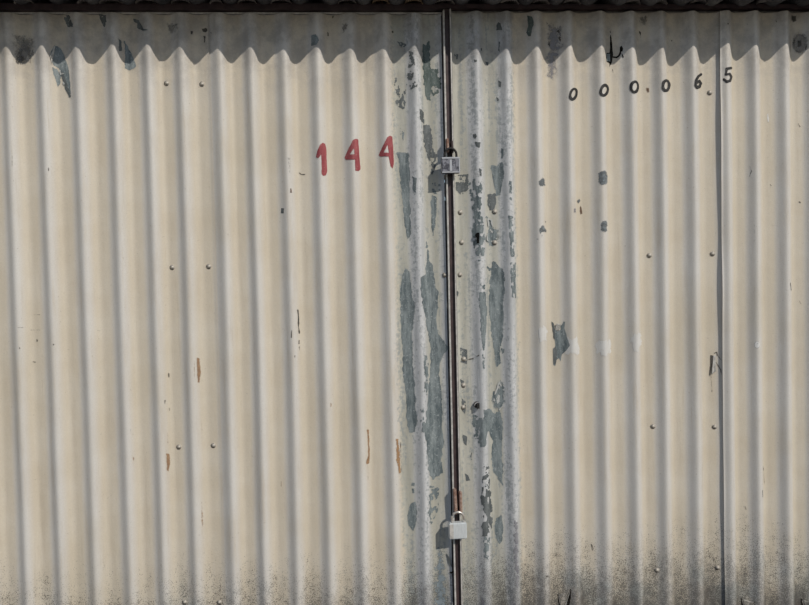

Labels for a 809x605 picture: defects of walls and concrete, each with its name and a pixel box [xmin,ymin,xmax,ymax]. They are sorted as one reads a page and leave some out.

peeling [50,45,71,97]
peeling [392,31,442,109]
peeling [397,109,448,531]
peeling [552,322,570,366]
peeling [460,379,505,559]